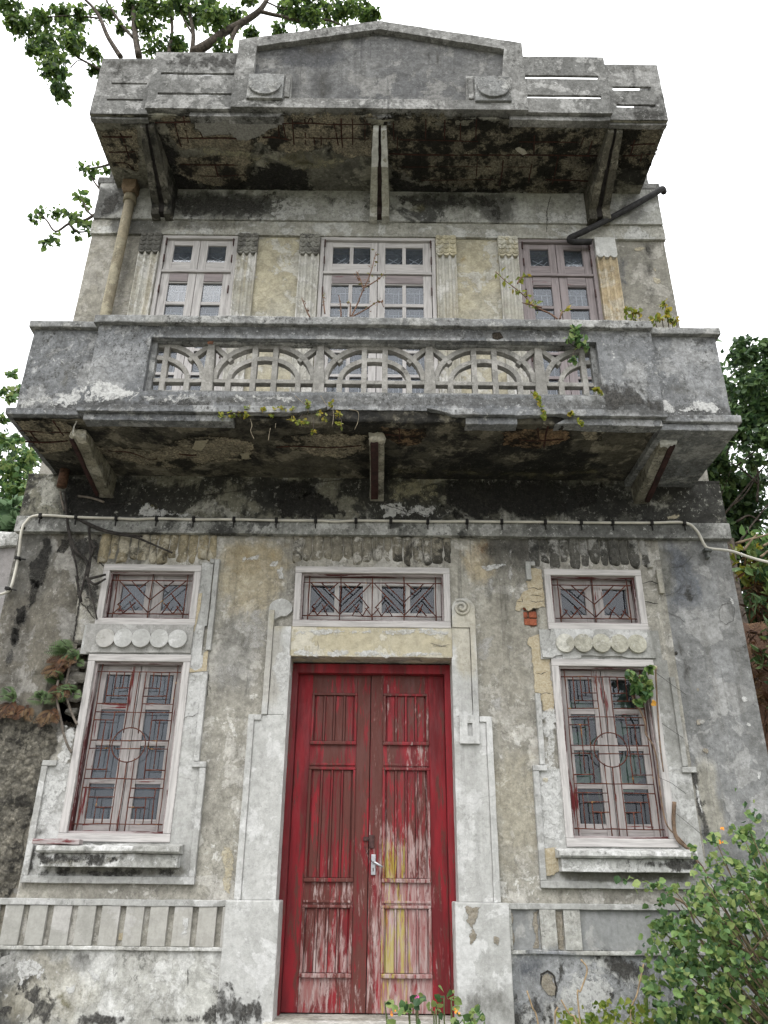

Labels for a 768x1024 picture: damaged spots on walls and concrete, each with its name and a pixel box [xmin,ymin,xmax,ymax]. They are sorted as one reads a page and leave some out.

spalling [98,127,140,172]
spalling [147,110,606,194]
water stain [389,159,523,220]
spalling [235,410,466,458]
spalling [501,417,602,449]
water stain [277,480,346,519]
water stain [441,470,603,520]
water stain [5,538,98,664]
peeling [515,568,564,876]
spalling [465,906,479,945]
water stain [77,1012,124,1024]
water stain [162,982,262,1024]